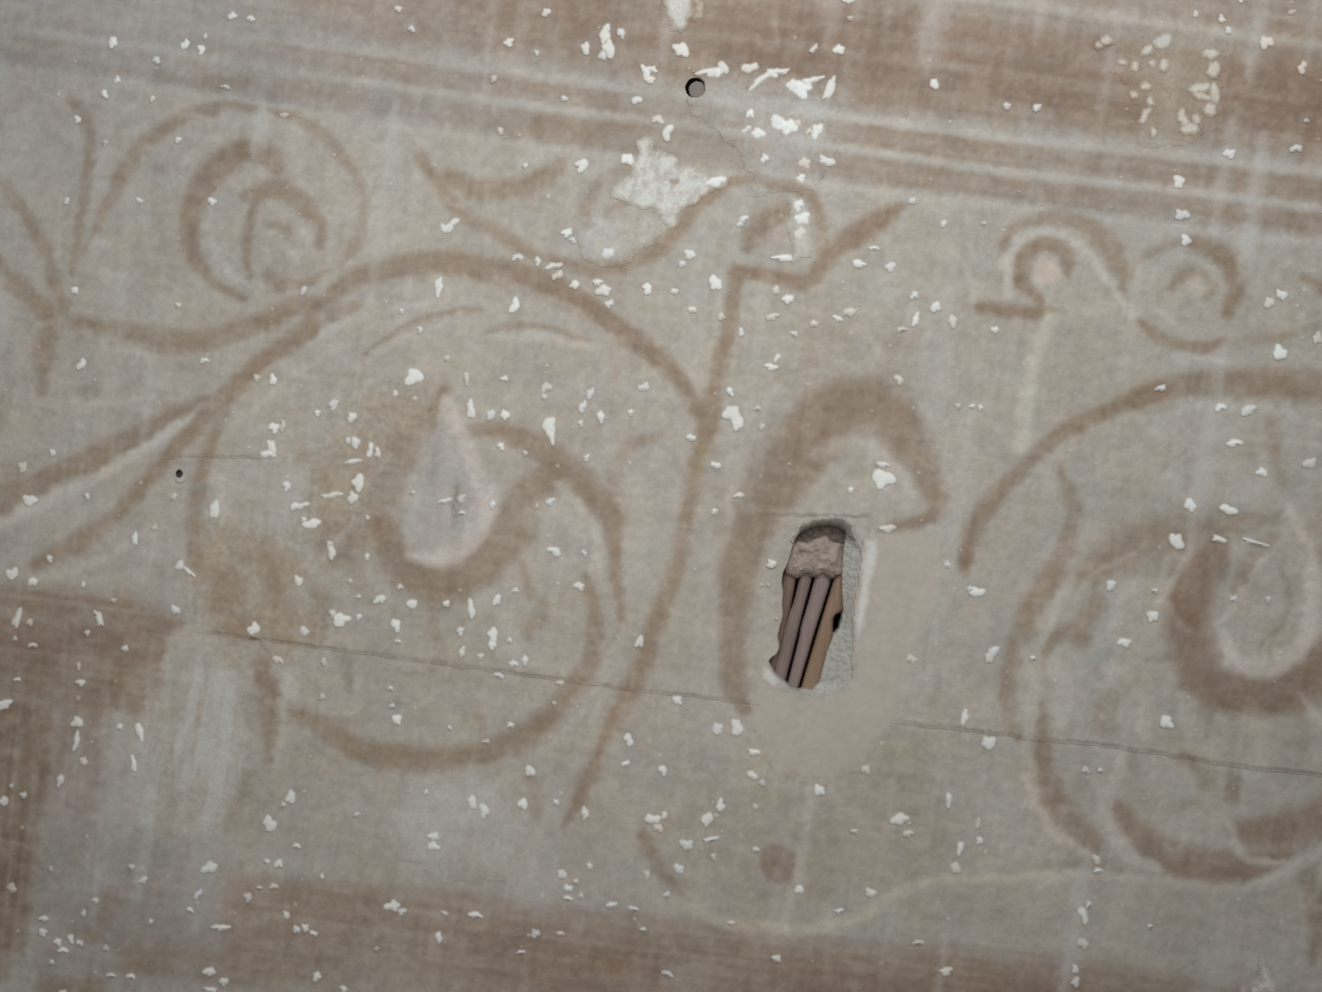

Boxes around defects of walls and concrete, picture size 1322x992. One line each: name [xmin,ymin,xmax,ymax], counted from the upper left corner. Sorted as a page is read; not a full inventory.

peeling [662,0,704,57]
spalling [609,114,732,249]
peeling [736,214,750,228]
peeling [721,386,766,432]
spalling [766,522,861,696]
peeling [1077,900,1093,951]
peeling [1070,963,1080,989]